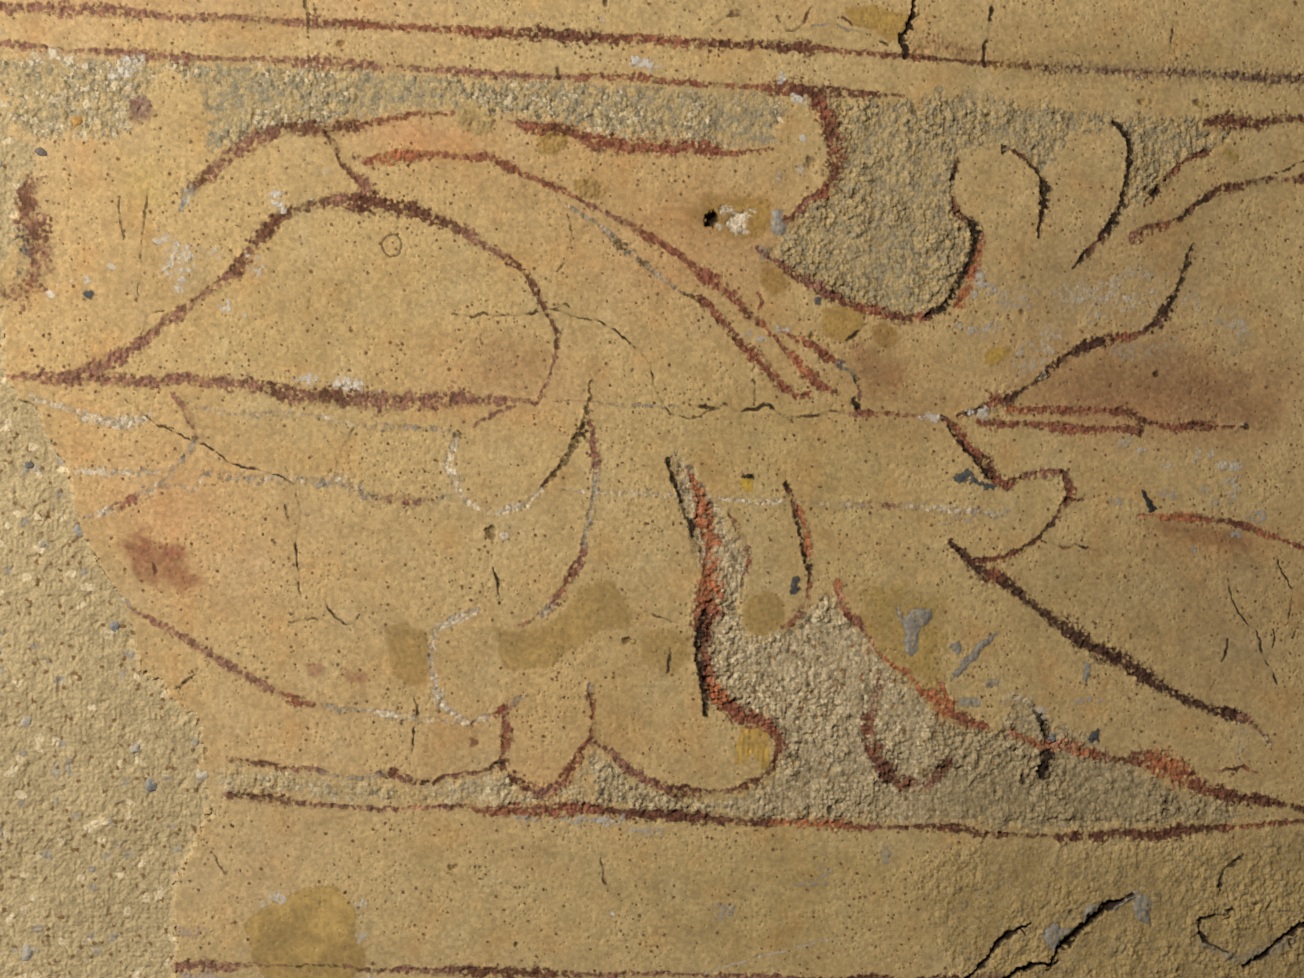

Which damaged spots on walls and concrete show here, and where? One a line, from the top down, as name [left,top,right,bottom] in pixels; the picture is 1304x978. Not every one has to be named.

crack [898,0,919,60]
spalling [0,48,791,160]
spalling [759,86,1233,315]
spalling [213,448,1304,978]
crack [965,893,1134,978]
crack [1198,853,1304,968]